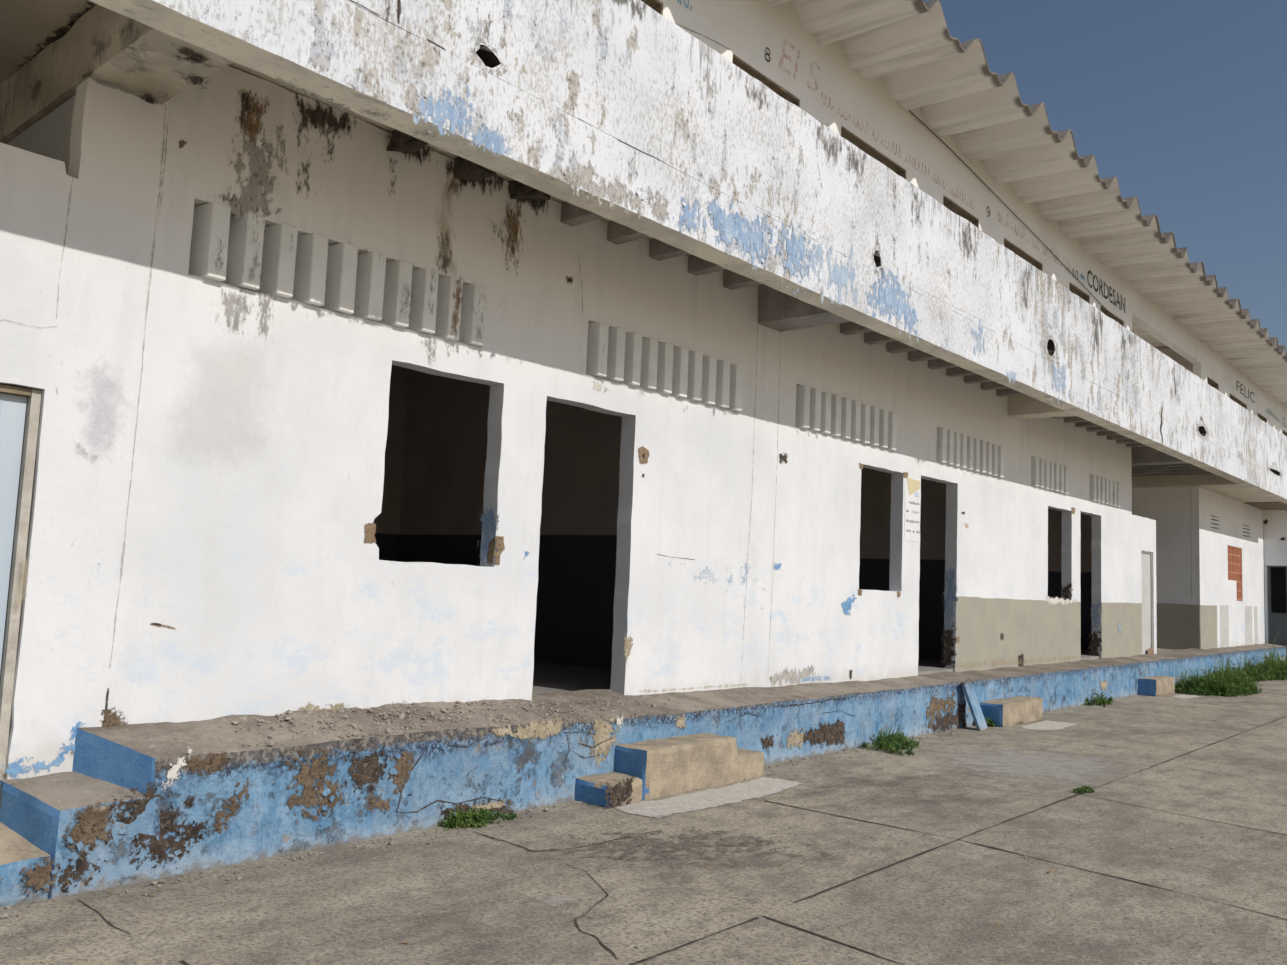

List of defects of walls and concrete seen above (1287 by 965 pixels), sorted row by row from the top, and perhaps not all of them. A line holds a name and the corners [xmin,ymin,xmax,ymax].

crack [350,0,401,24]
damp [275,78,384,192]
damp [390,128,435,192]
damp [222,239,276,337]
peeling [563,161,919,342]
spalling [364,523,377,544]
peeling [477,507,505,567]
peeling [939,565,960,672]
spalling [761,718,845,749]
spalling [926,689,969,732]
spalling [18,747,253,896]
spalling [285,746,415,826]